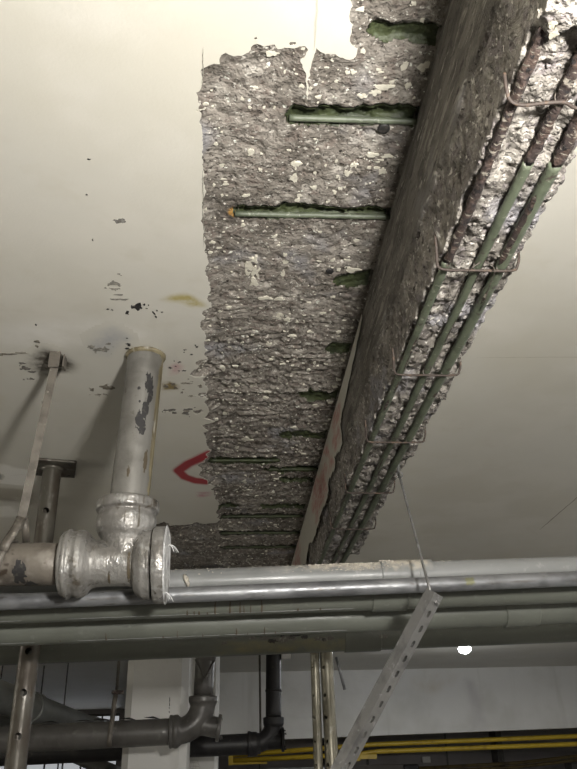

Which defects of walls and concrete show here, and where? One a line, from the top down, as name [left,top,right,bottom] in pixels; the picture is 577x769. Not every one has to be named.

peeling [104,273,163,318]
spalling [135,0,577,570]
peeling [0,340,40,380]